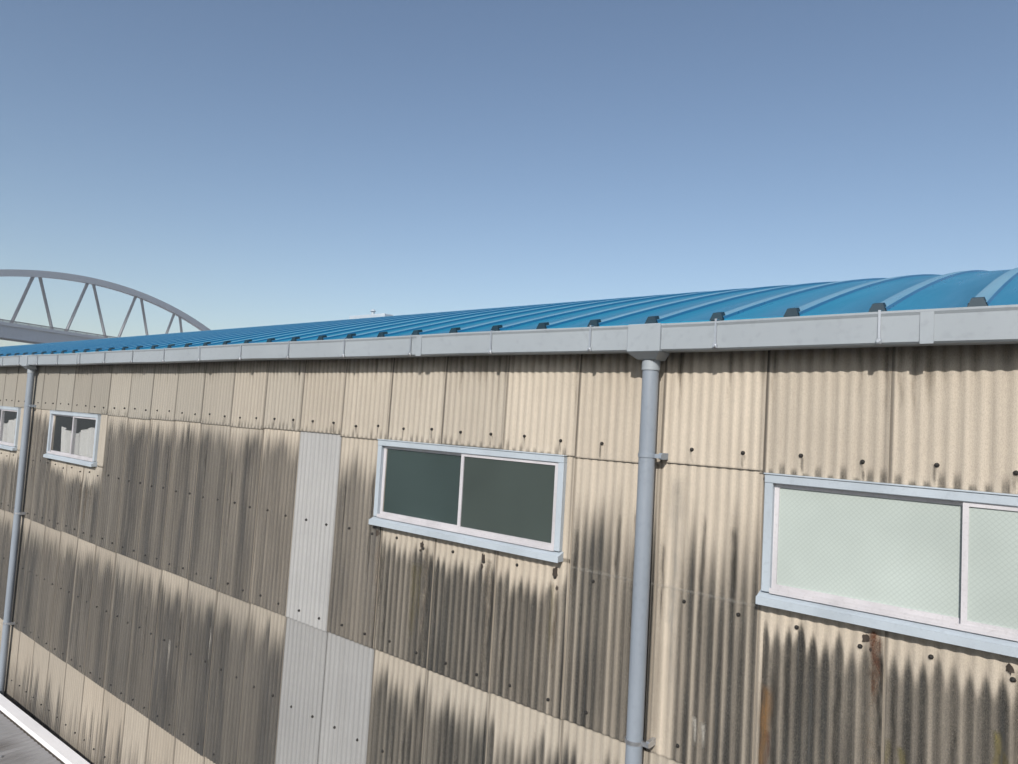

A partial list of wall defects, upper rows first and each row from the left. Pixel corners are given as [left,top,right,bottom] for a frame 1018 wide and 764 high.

water stain [0,416,297,764]
water stain [369,674,576,764]
water stain [327,467,634,742]
water stain [643,551,655,750]
water stain [670,543,1018,764]